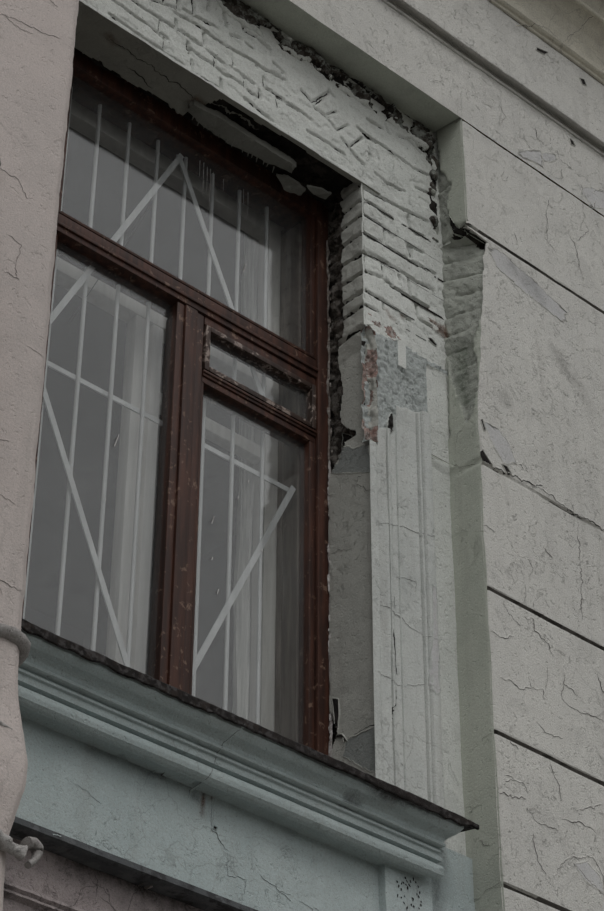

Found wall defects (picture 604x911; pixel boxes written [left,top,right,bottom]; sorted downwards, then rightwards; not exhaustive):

crack [0,13,60,38]
crack [4,235,23,279]
peeling [188,99,331,199]
flaking render [216,0,568,323]
crack [521,128,604,280]
peeling [327,407,370,475]
spalling [386,413,394,434]
crack [432,426,604,619]
crack [490,601,604,721]
crack [211,797,319,911]
crack [498,764,604,894]